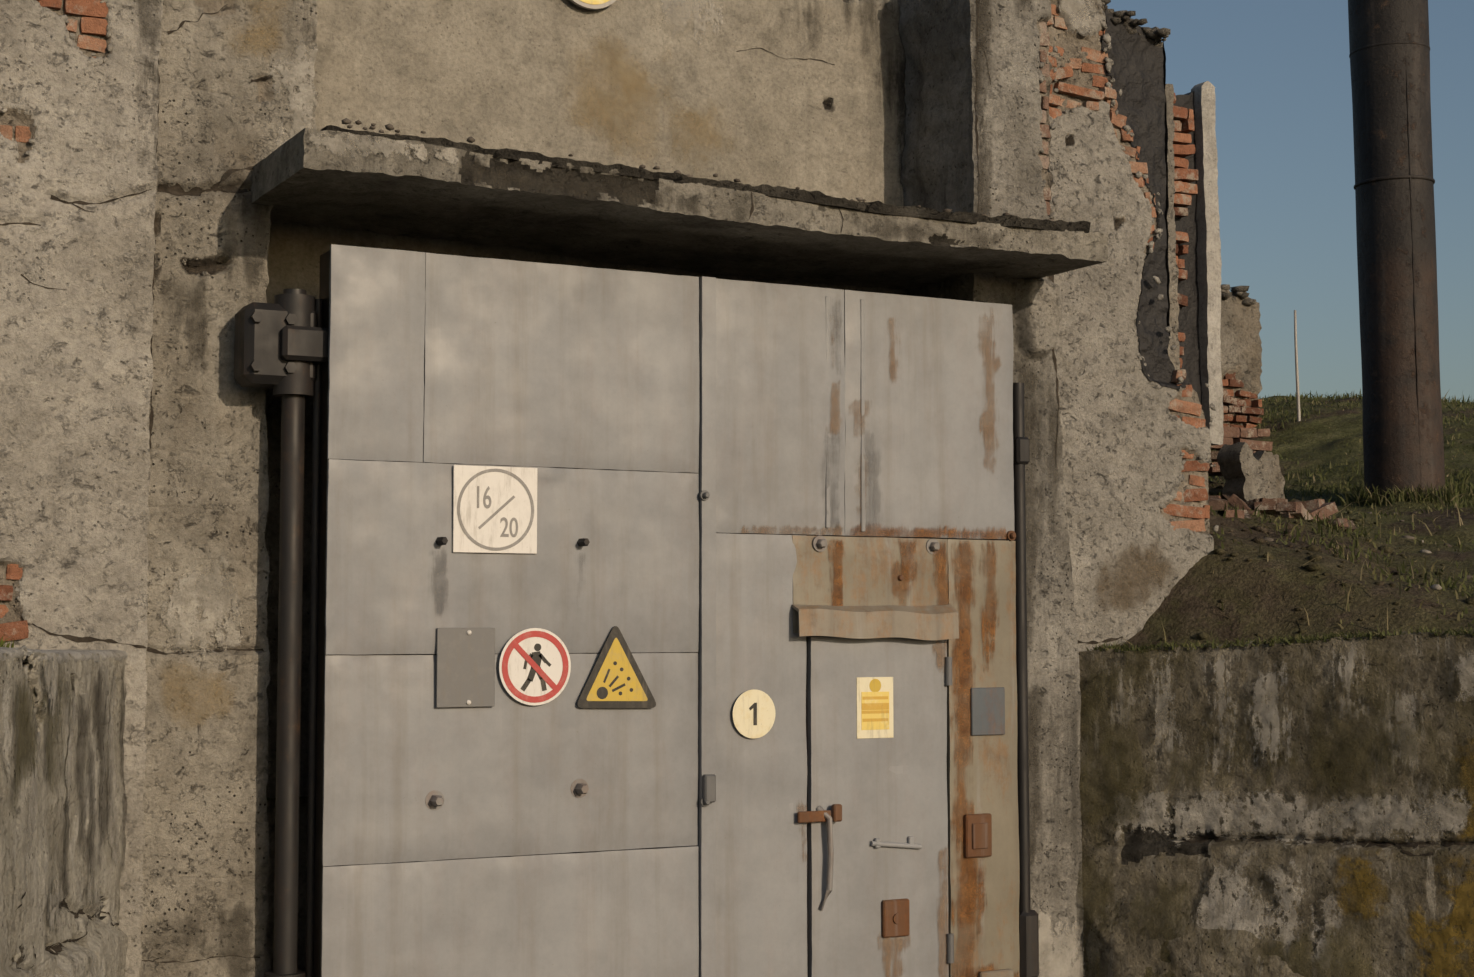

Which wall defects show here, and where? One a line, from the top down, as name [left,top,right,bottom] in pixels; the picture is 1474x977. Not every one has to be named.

spalling [34,0,118,67]
spalling [341,118,400,135]
peeling [1037,0,1273,541]
spalling [0,564,43,732]
rust [828,526,1007,977]
water stain [44,656,127,929]
crack [1181,826,1474,856]
crack [15,892,119,969]
crack [142,955,260,963]